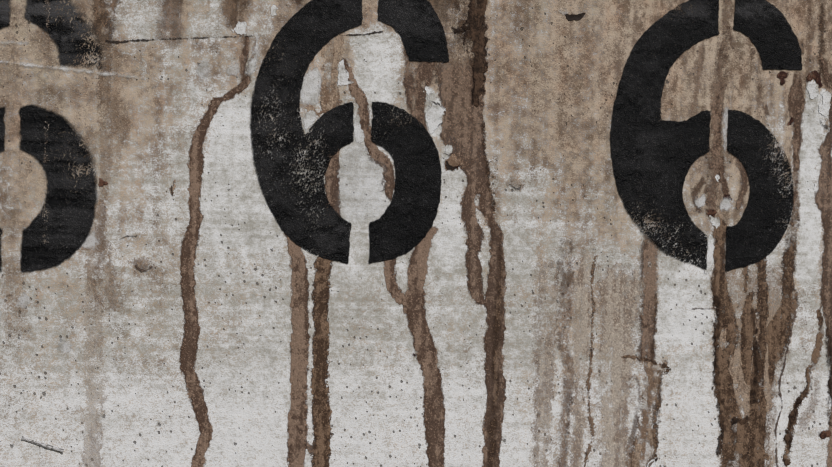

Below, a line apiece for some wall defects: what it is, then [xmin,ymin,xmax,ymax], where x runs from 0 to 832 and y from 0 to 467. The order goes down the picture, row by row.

leakage [159,0,181,41]
crack [106,35,252,44]
leakage [222,0,249,27]
peeling [423,86,446,134]
peeling [806,83,831,129]
rust [324,141,341,221]
rust [179,36,256,467]
rust [436,0,507,467]
rust [692,57,832,467]
rust [284,230,333,467]
rust [384,227,445,467]